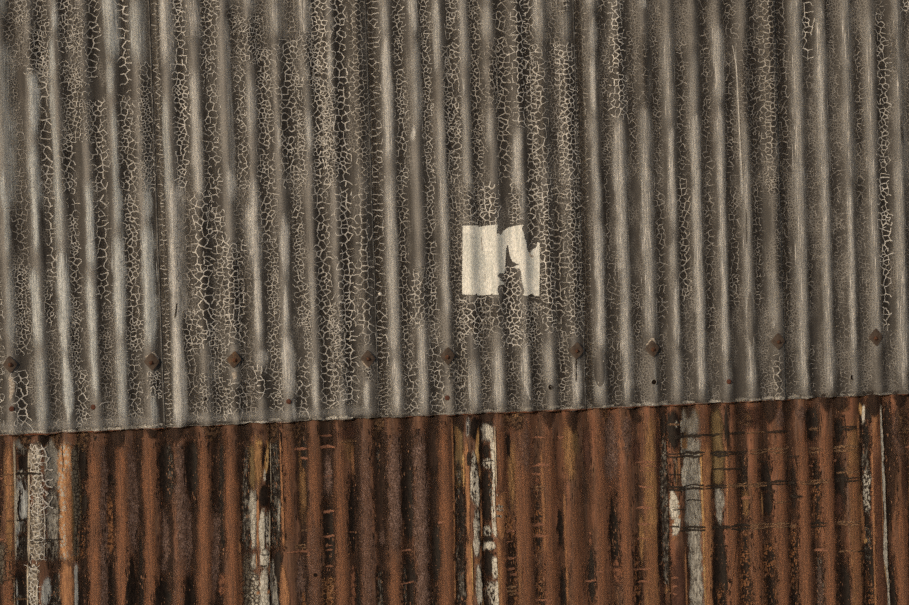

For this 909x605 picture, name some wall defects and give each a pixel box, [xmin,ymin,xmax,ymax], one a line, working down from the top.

crack [0,0,909,431]
peeling [0,423,182,605]
peeling [236,418,293,605]
corrosion [58,410,691,605]
peeling [430,396,791,605]